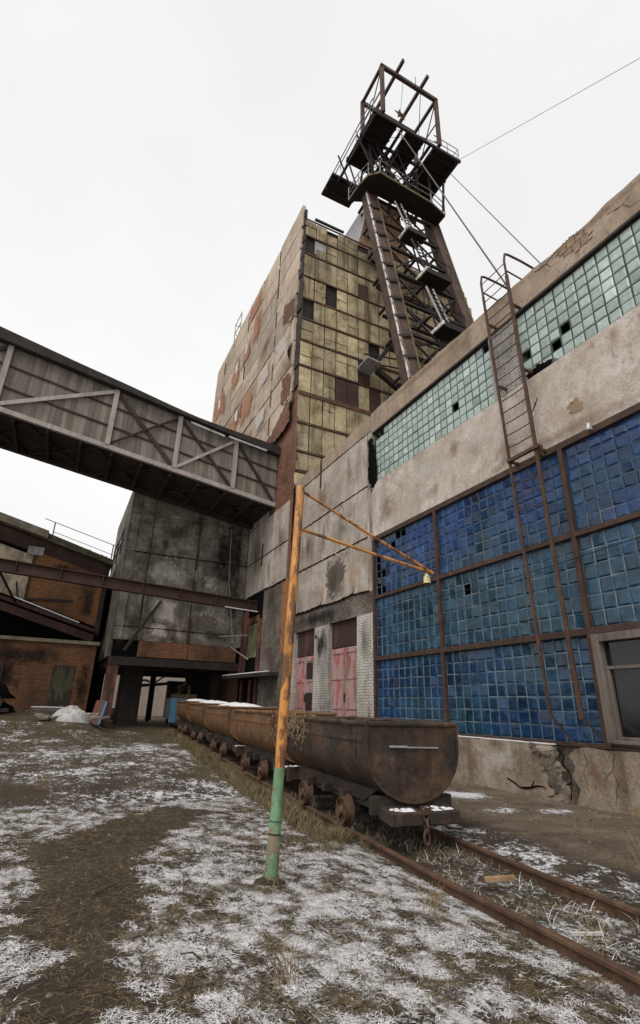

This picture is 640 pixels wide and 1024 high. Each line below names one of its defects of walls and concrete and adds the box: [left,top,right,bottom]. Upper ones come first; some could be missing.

flaking render [214,292,295,436]
peeling [566,397,583,414]
flaking render [265,373,298,494]
spalling [367,436,377,492]
water stain [151,600,177,637]
spalling [507,742,567,796]
crack [557,747,622,802]